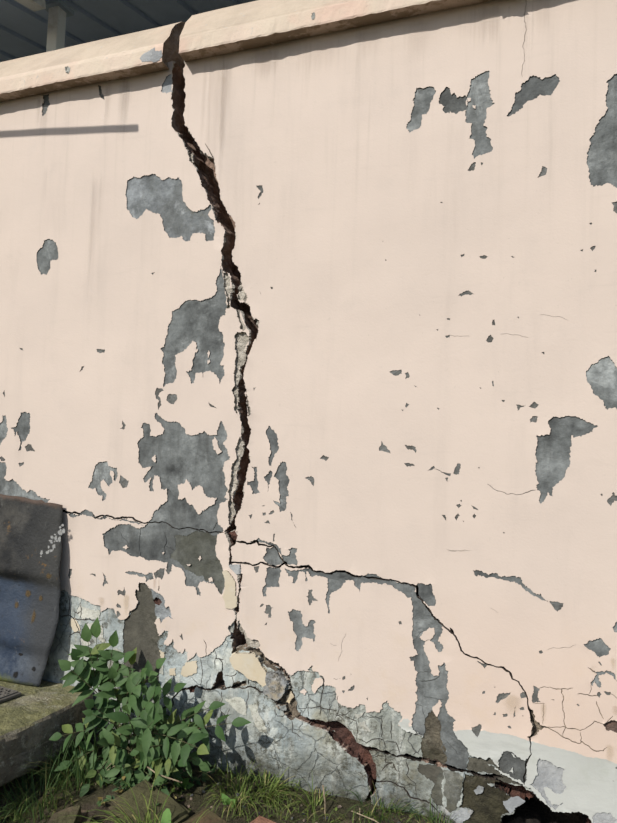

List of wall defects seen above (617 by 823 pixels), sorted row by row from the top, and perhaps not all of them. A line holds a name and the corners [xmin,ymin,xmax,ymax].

peeling [406,71,494,171]
peeling [507,74,560,116]
peeling [587,74,617,188]
peeling [125,174,215,241]
peeling [0,412,35,451]
peeling [65,264,230,623]
peeling [247,426,296,527]
crack [93,61,613,823]
peeling [535,416,598,504]
peeling [586,356,617,410]
crack [61,596,101,645]
peeling [250,534,566,823]